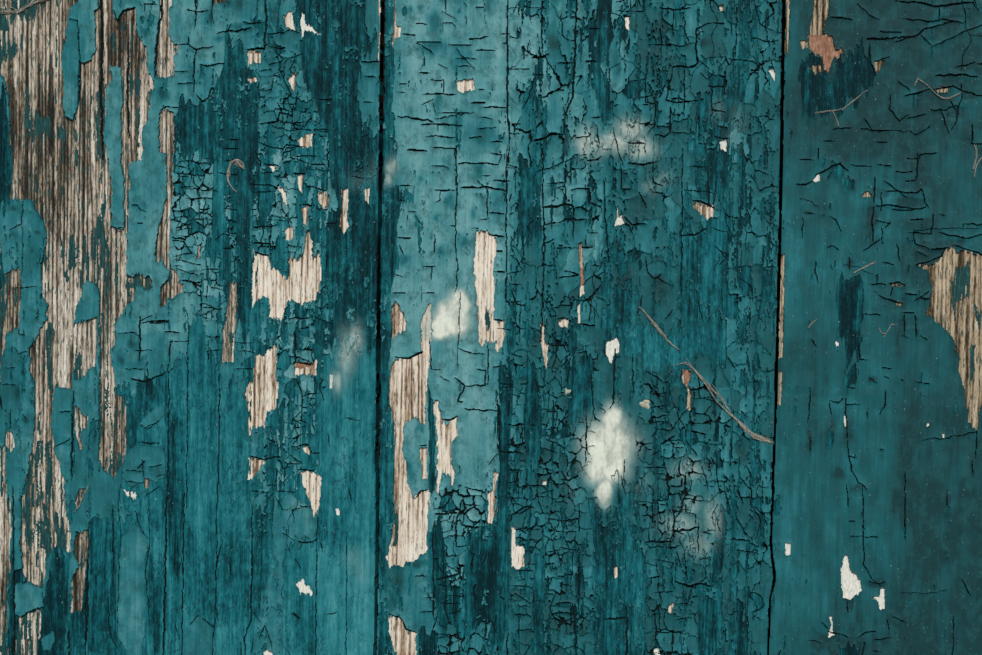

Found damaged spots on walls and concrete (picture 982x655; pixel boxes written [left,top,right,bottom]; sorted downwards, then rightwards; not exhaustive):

peeling [798,0,885,123]
crack [68,0,371,655]
peeling [0,0,458,655]
crack [390,0,982,655]
peeling [916,246,982,430]
peeling [462,229,548,655]
peeling [592,507,650,655]
spalling [841,555,863,600]
spalling [872,588,885,609]